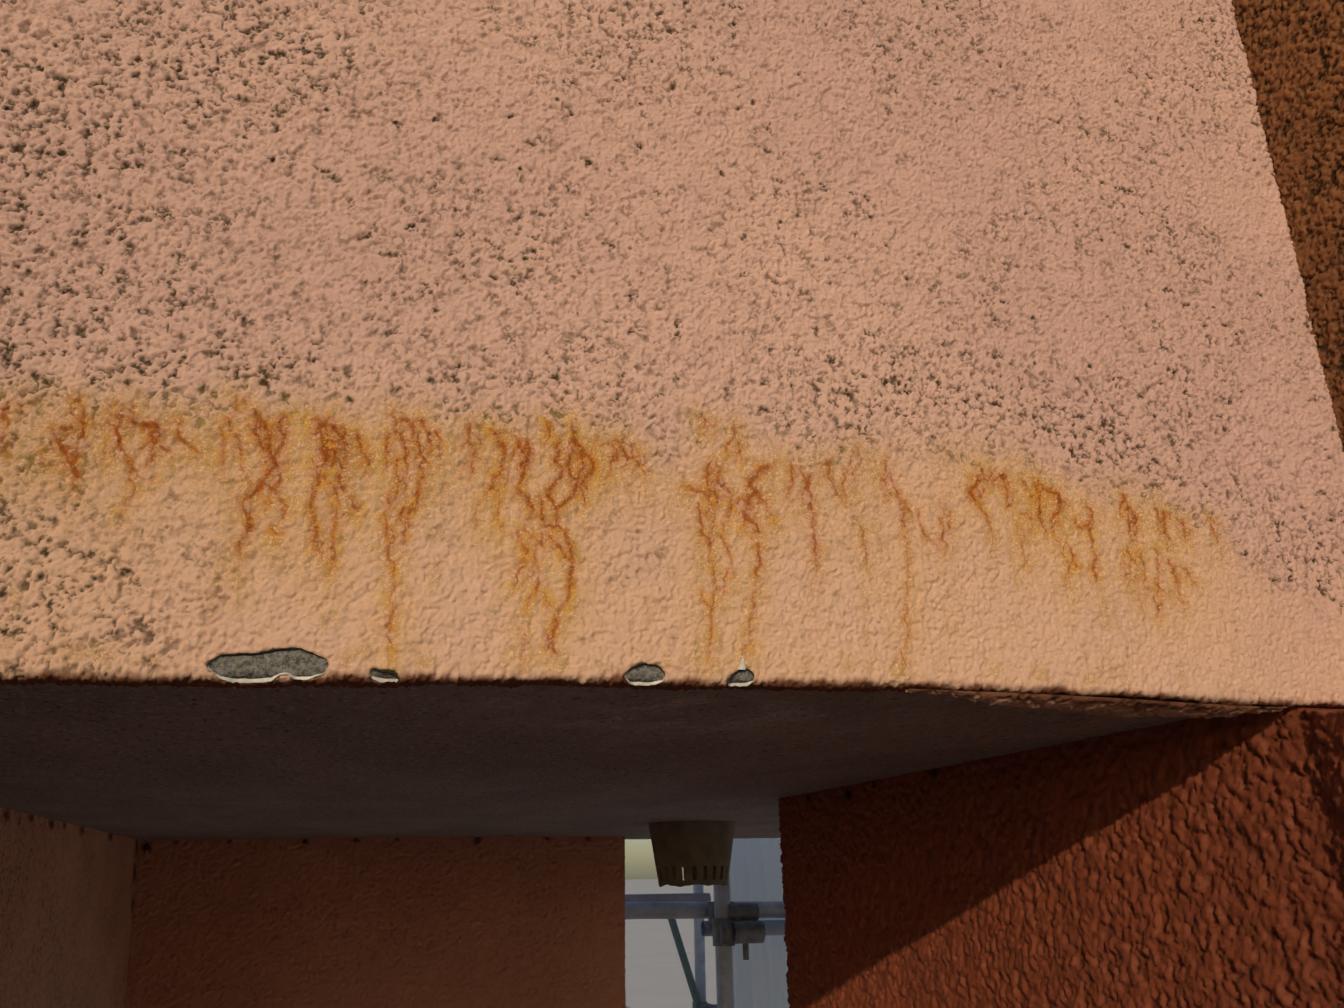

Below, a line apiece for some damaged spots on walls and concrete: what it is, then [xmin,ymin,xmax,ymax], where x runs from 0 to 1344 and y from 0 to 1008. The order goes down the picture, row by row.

rust [217,396,449,666]
rust [467,416,645,663]
rust [682,417,779,663]
rust [967,469,1101,582]
rust [1119,495,1193,611]
peeling [207,647,328,683]
peeling [370,668,399,683]
peeling [623,663,665,686]
peeling [727,658,754,687]